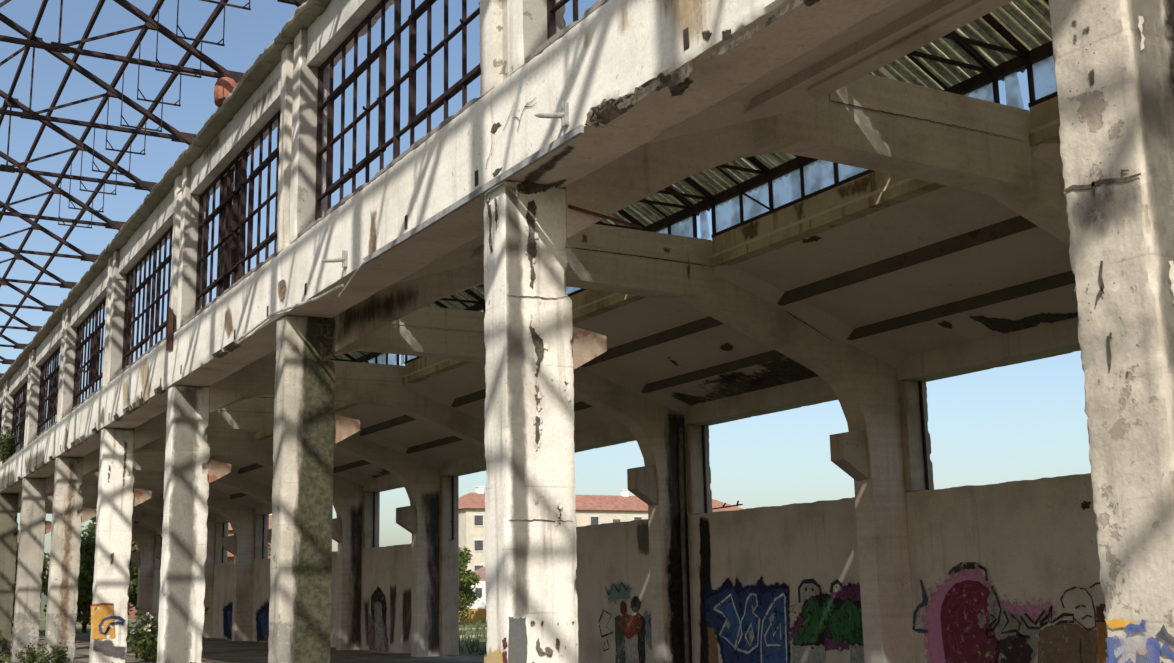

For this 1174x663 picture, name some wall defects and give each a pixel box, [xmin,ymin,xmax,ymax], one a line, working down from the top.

spalling [585,60,693,128]
spalling [708,0,820,60]
peeling [516,146,573,288]
crack [1064,169,1141,196]
peeling [529,314,548,450]
peeling [966,309,1078,333]
damp [290,292,411,663]
damp [665,357,818,663]